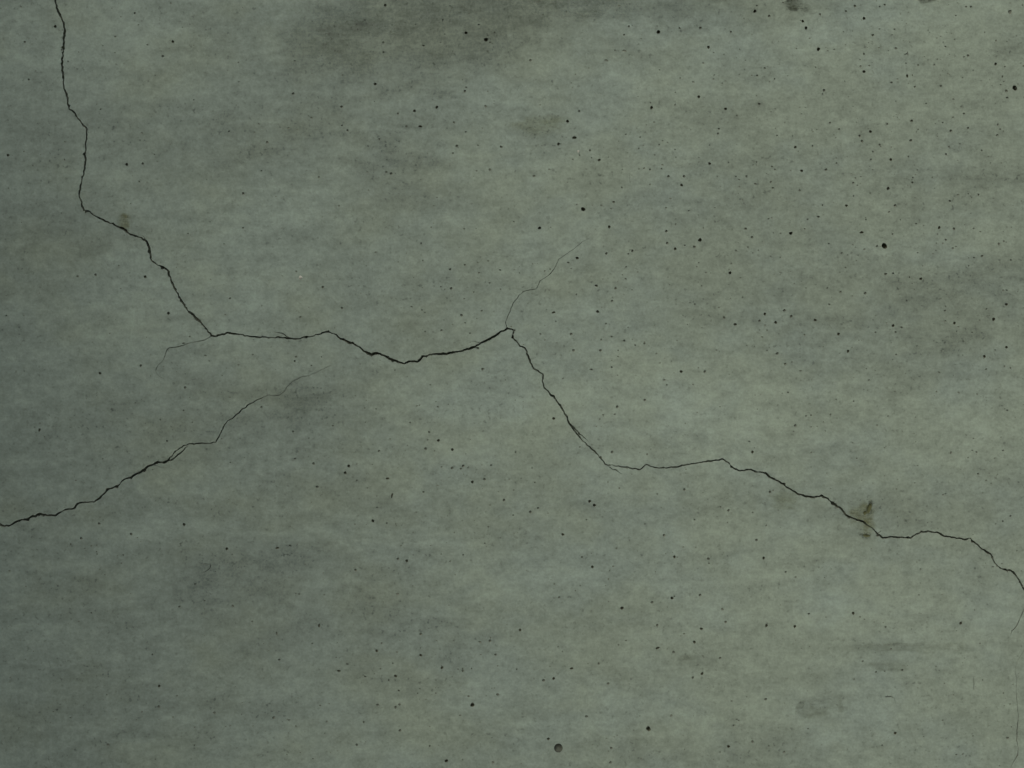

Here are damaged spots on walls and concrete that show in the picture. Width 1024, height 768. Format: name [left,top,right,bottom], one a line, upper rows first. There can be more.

crack [0,365,332,527]
crack [54,0,1024,633]